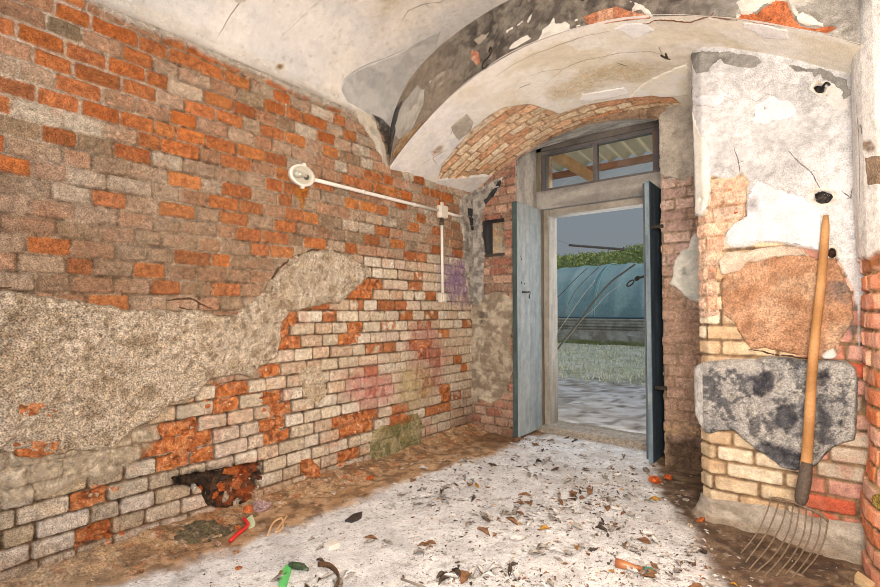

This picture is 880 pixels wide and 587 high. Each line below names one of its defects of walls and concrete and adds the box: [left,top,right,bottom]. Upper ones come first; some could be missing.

flaking render [509,1,655,49]
flaking render [736,0,835,40]
peeling [392,69,454,160]
crack [789,105,862,199]
corrosion [296,186,308,209]
spalling [438,51,854,359]
spalling [349,279,388,311]
spalling [279,311,301,350]
spalling [338,322,362,345]
spalling [140,380,291,508]
spalling [332,409,377,439]
spalling [73,518,124,551]